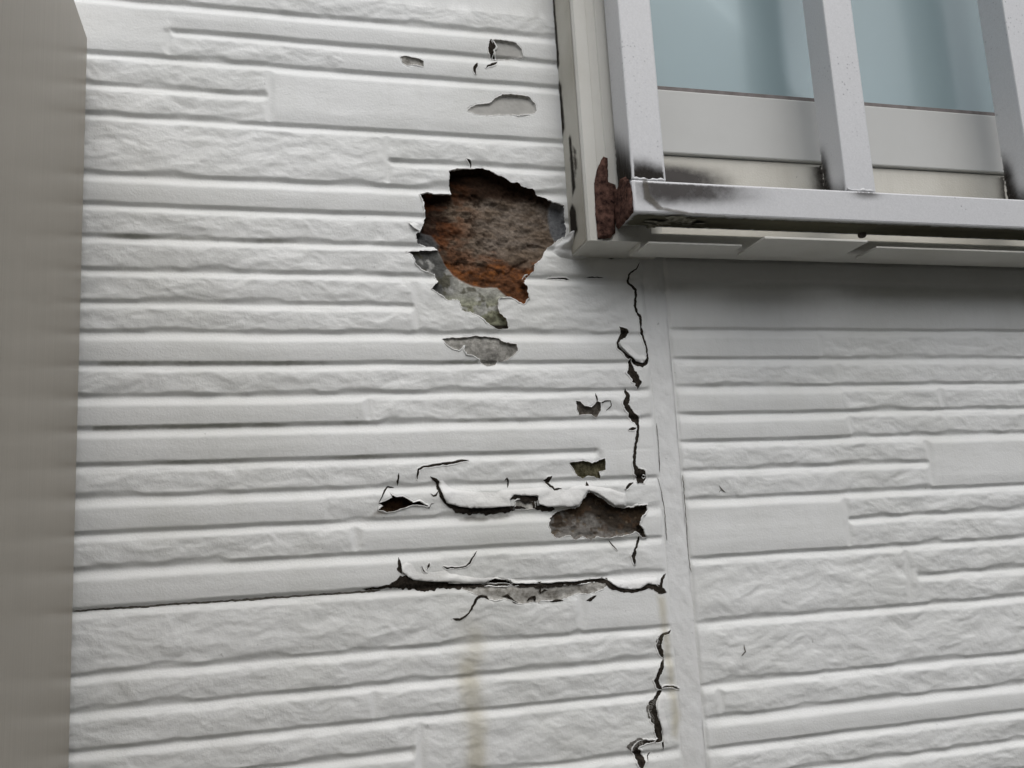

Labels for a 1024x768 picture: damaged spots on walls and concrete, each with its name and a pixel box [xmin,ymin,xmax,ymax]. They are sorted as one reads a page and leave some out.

peeling [400,55,424,68]
peeling [491,39,524,61]
peeling [467,93,537,117]
spalling [406,167,568,367]
crack [74,262,691,621]
peeling [575,400,602,419]
spalling [439,458,649,541]
crack [627,629,679,768]